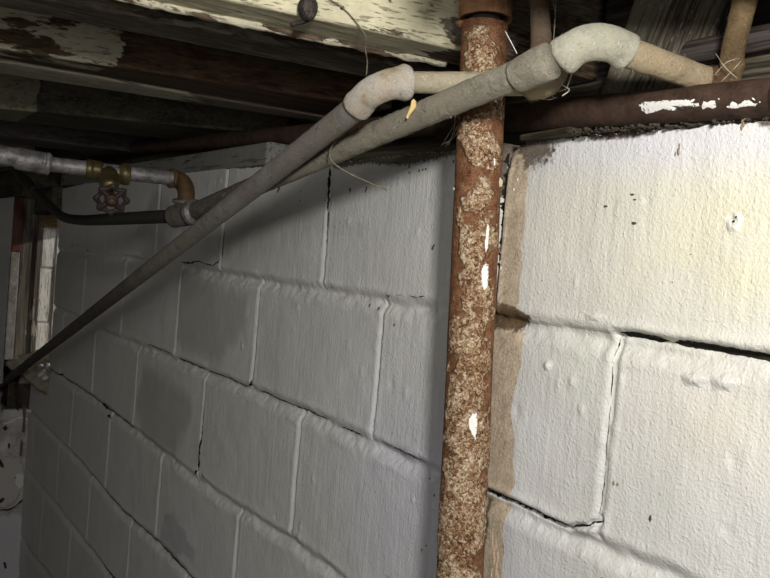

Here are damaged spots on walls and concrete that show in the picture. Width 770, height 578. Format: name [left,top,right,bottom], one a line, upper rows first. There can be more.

crack [324,167,332,243]
crack [182,235,224,266]
crack [51,369,135,428]
crack [195,413,204,478]
crack [148,344,364,437]
crack [489,331,770,527]
crack [82,462,193,578]